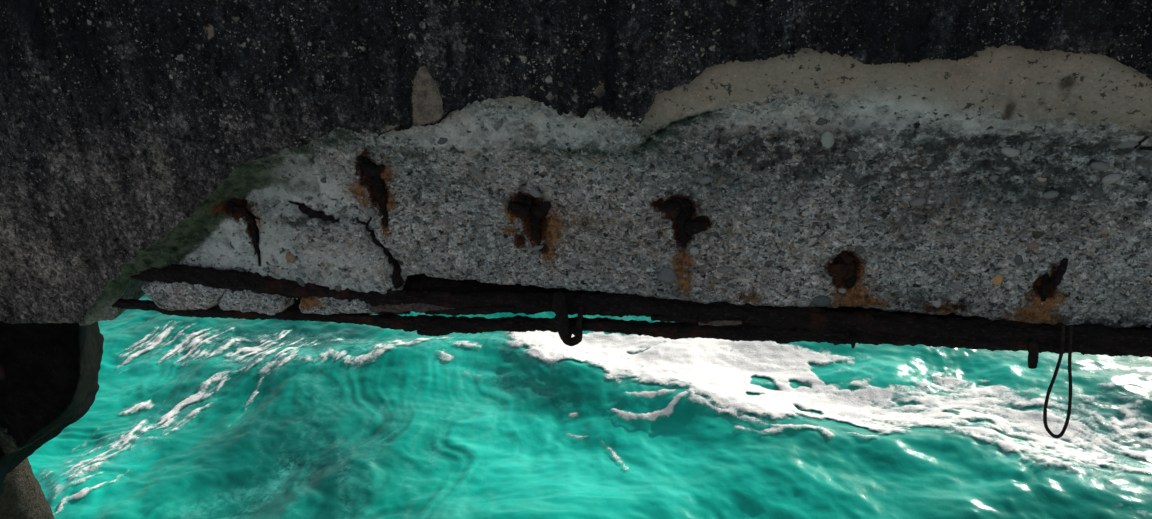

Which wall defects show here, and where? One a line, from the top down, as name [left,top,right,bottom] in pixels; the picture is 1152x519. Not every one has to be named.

corrosion [213,198,261,245]
crack [288,201,405,289]
corrosion [349,149,395,236]
corrosion [360,302,514,316]
corrosion [503,193,564,263]
spalling [79,45,1152,328]
corrosion [650,193,714,295]
corrosion [651,315,742,326]
corrosion [823,248,889,307]
corrosion [1008,266,1065,324]